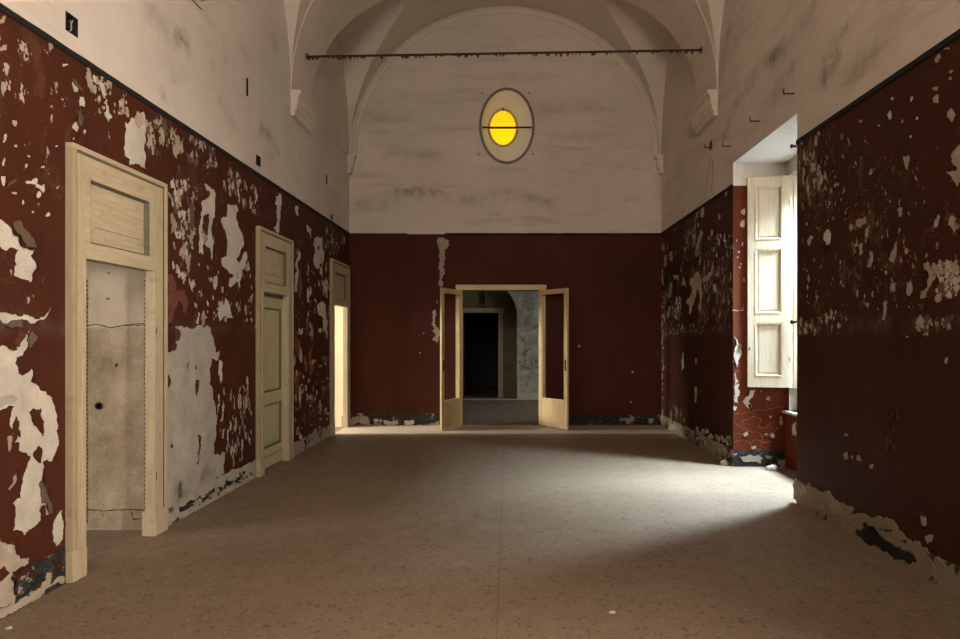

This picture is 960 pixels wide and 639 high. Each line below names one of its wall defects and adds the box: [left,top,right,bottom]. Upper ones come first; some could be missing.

peeling [0,219,39,282]
crack [87,296,145,328]
peeling [72,67,259,522]
peeling [294,206,345,440]
peeling [423,301,440,343]
flaking render [437,237,449,286]
peeling [661,207,770,453]
peeling [797,136,960,338]
peeling [0,304,66,619]
flaking render [350,415,440,425]
flaking render [740,446,762,462]
flaking render [793,479,945,579]